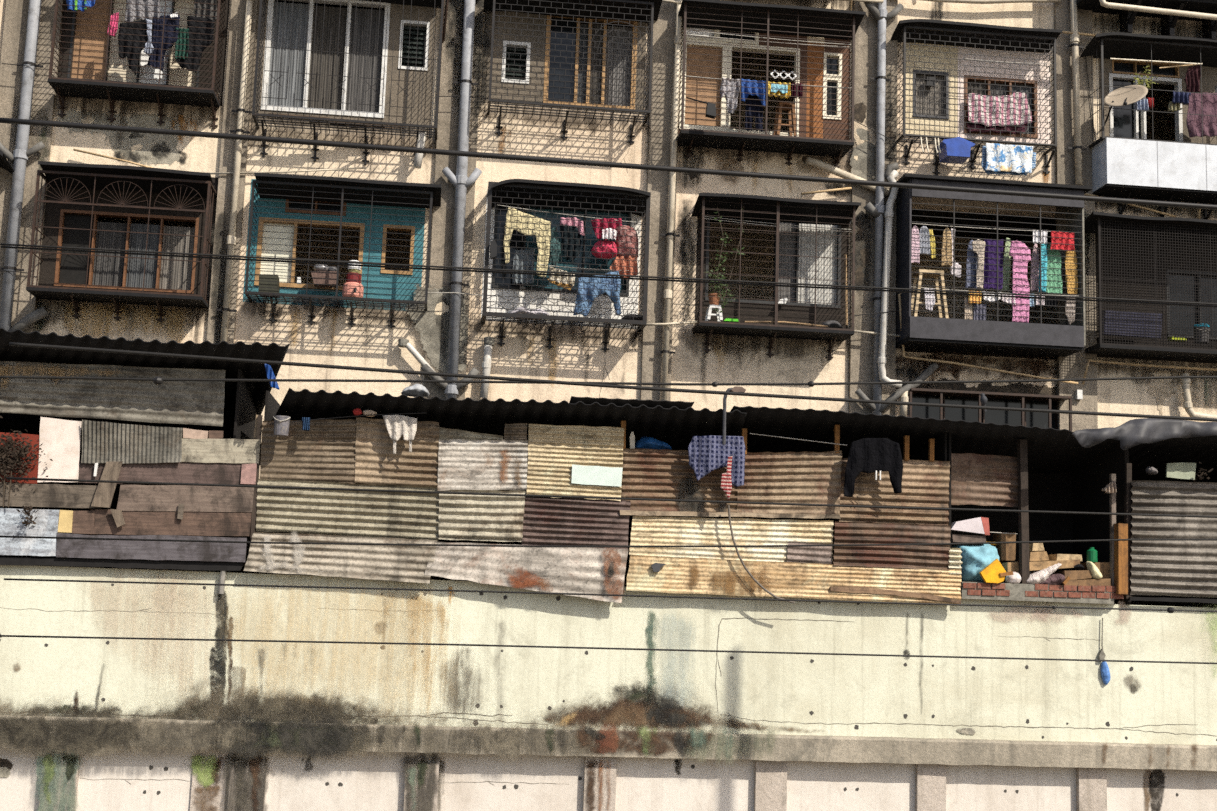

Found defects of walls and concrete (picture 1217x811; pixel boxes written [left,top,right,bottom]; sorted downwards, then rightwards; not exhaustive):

corrosion [510,571,549,590]
corrosion [602,548,623,599]
damp [0,591,774,811]
damp [1143,749,1169,811]